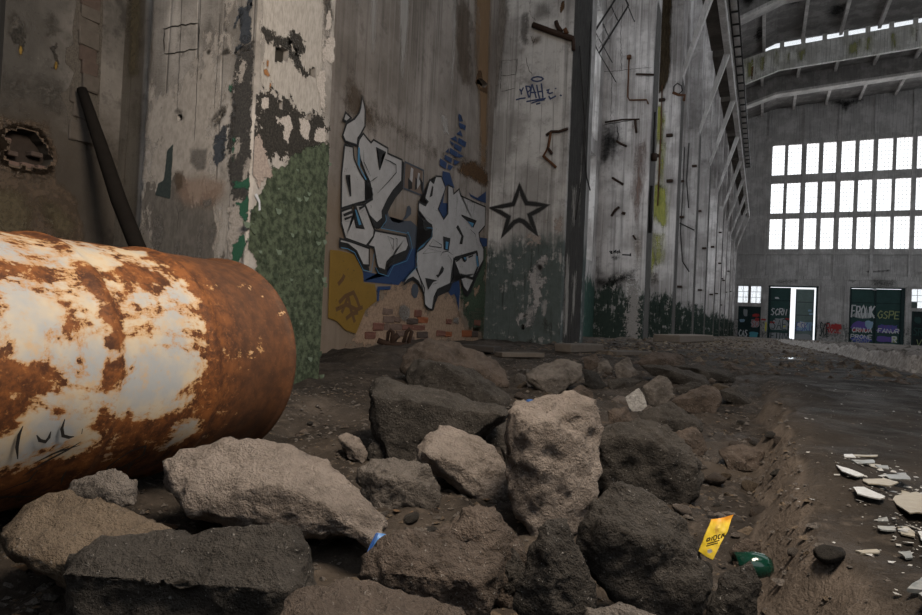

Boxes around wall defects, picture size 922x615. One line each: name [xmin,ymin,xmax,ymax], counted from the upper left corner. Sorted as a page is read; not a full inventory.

flaking render [60,0,103,146]
spalling [0,122,59,175]
peeling [139,0,335,384]
flaking render [345,243,488,348]